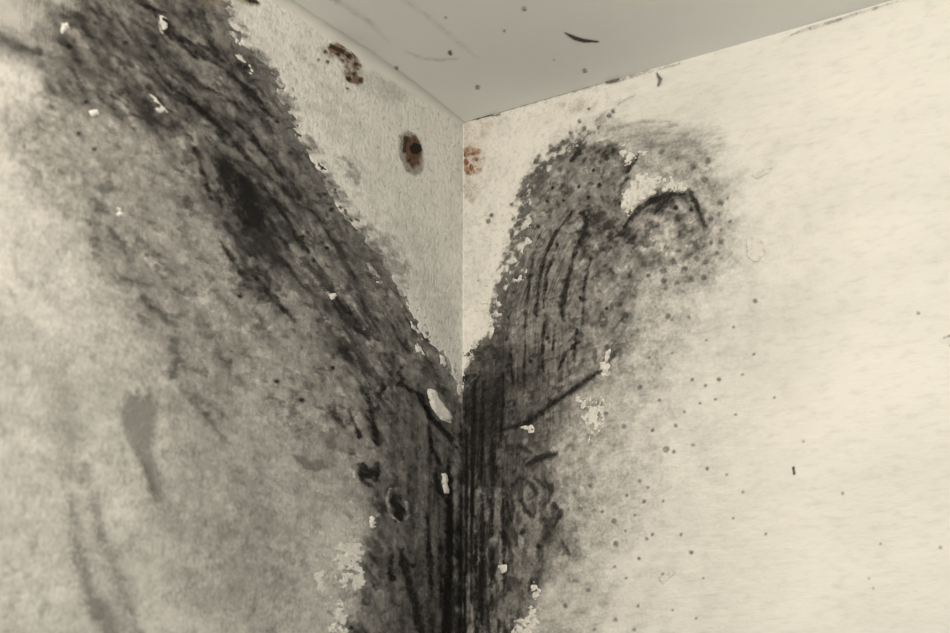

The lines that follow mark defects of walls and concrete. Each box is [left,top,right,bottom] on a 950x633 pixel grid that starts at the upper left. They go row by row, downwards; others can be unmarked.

rust [318,43,364,89]
rust [400,131,423,175]
rust [463,147,480,175]
leakage [0,0,730,633]